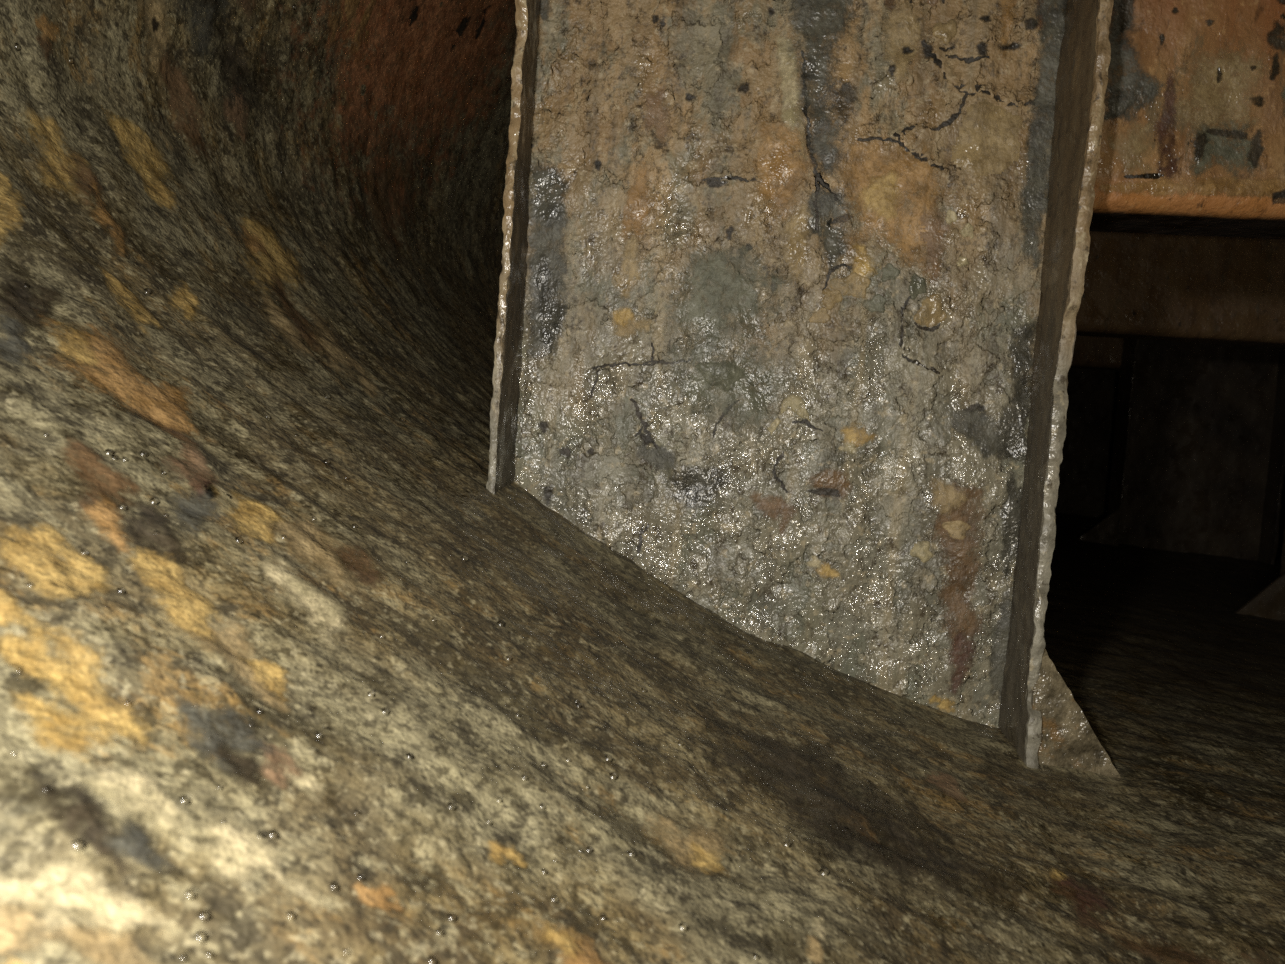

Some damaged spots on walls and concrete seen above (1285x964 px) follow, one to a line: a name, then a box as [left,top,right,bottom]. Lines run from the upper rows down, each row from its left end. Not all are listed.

leakage [792,0,856,268]
crack [857,37,1038,170]
rust [1100,50,1285,198]
leakage [668,249,785,431]
leakage [638,443,727,508]
leakage [996,324,1036,574]
rust [929,479,984,713]
leakage [990,592,1011,698]